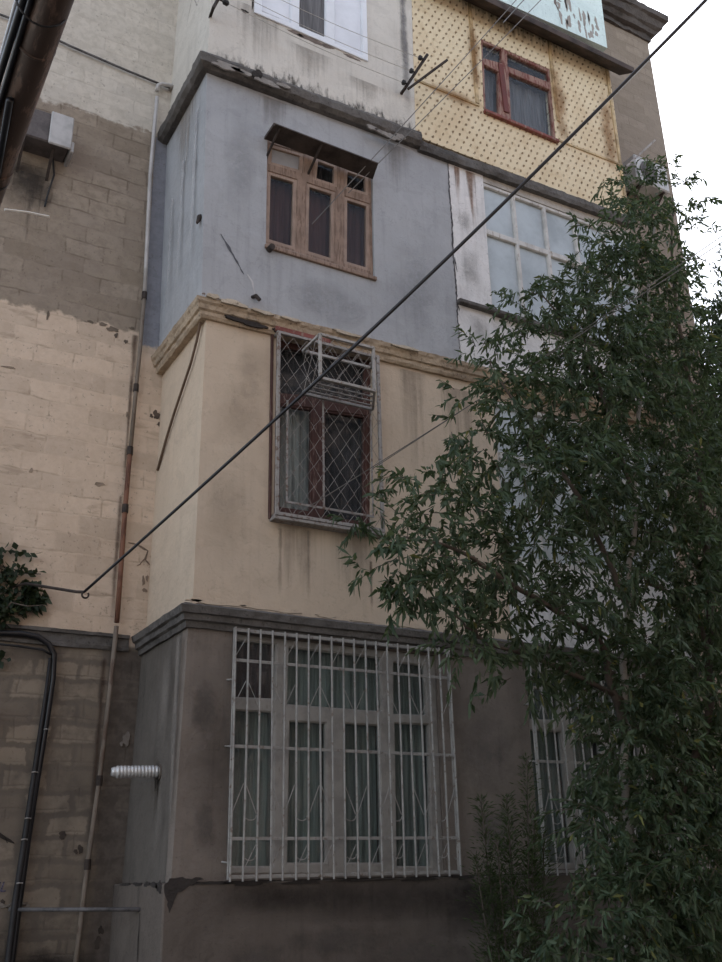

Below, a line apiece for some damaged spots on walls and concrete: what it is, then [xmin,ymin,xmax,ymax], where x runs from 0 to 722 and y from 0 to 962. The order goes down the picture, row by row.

peeling [557,0,599,38]
spalling [88,320,134,344]
spalling [120,877,320,913]